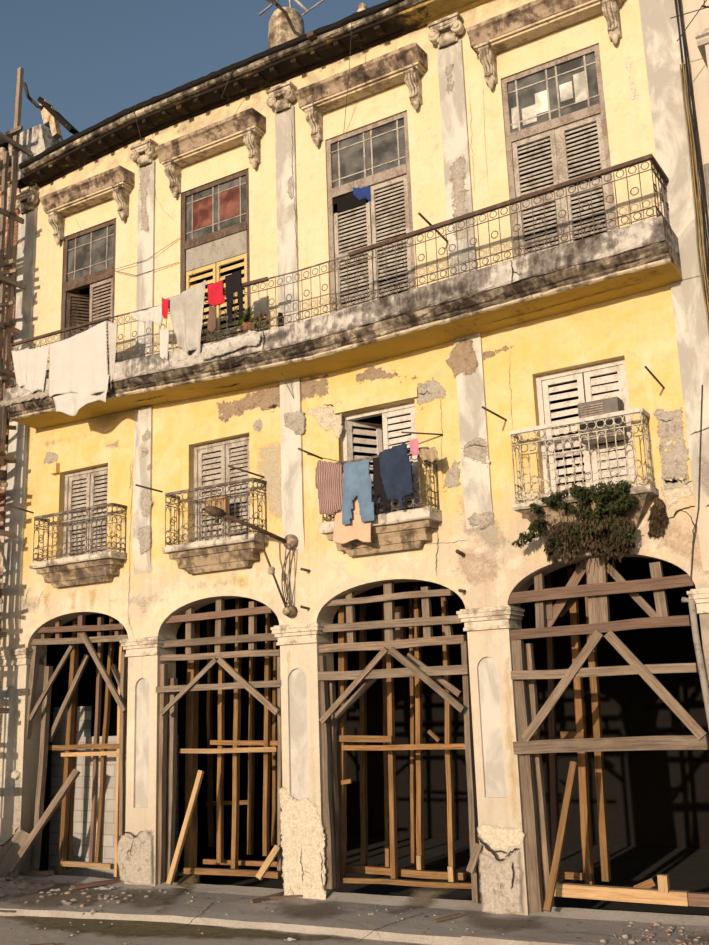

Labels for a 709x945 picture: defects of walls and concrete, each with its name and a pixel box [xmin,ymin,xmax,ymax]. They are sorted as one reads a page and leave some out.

peeling [446,338,511,377]
peeling [217,375,343,438]
peeling [356,366,446,410]
peeling [443,437,490,492]
peeling [652,407,693,510]
peeling [468,510,494,530]
spalling [278,787,326,900]
spalling [477,822,525,852]